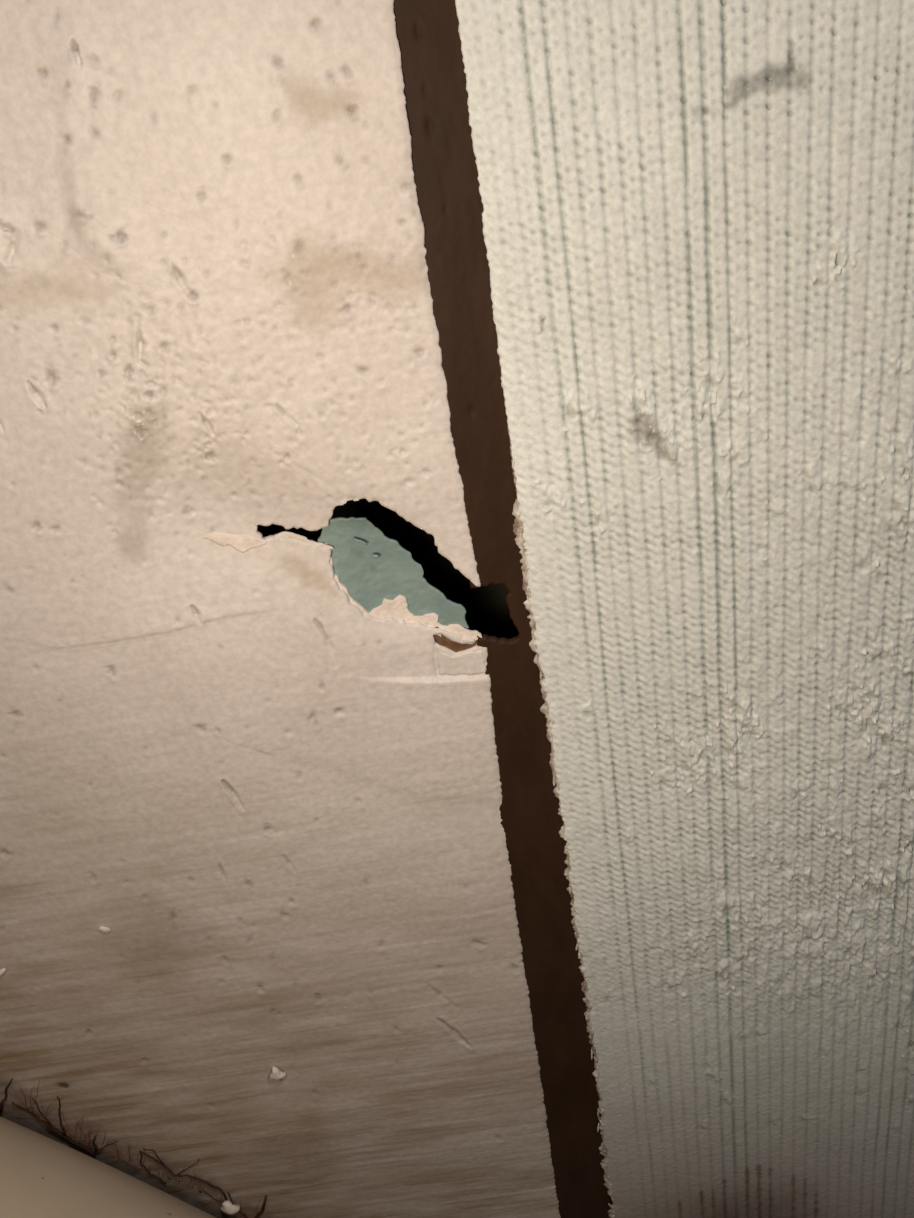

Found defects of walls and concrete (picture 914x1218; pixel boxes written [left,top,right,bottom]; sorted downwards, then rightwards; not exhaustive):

peeling [196,532,267,553]